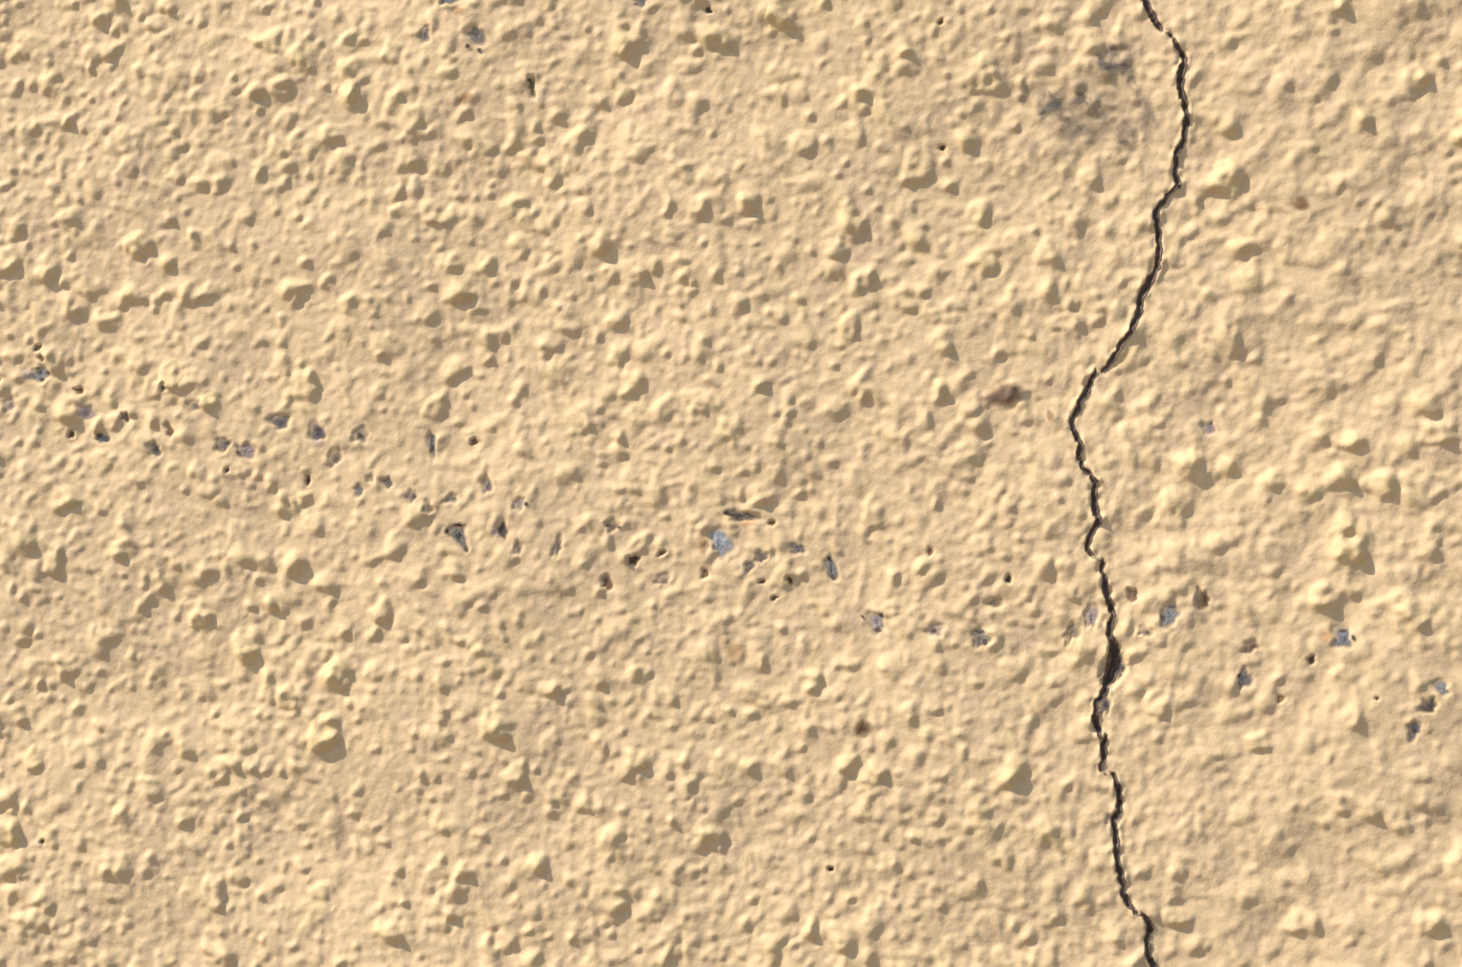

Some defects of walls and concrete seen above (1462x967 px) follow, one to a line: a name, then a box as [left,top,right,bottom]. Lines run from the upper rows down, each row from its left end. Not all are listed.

crack [1069,0,1189,967]